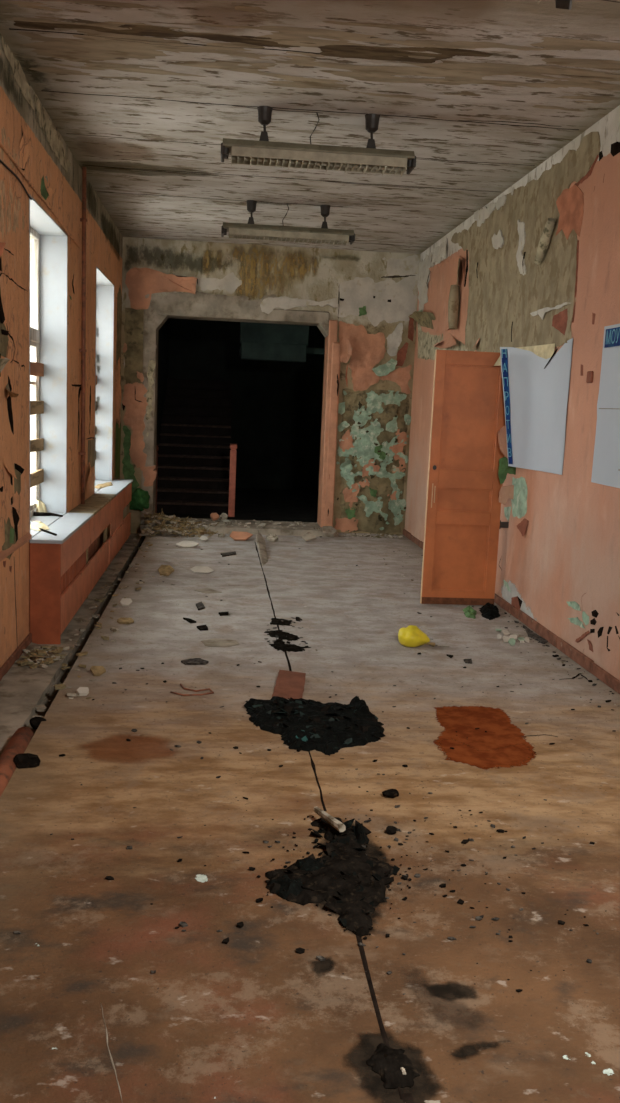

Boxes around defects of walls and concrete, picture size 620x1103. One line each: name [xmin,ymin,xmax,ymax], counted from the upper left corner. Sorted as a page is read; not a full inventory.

flaking render [0,292,19,435]
peeling [115,132,620,536]
flaking render [0,453,25,572]
peeling [566,593,620,652]